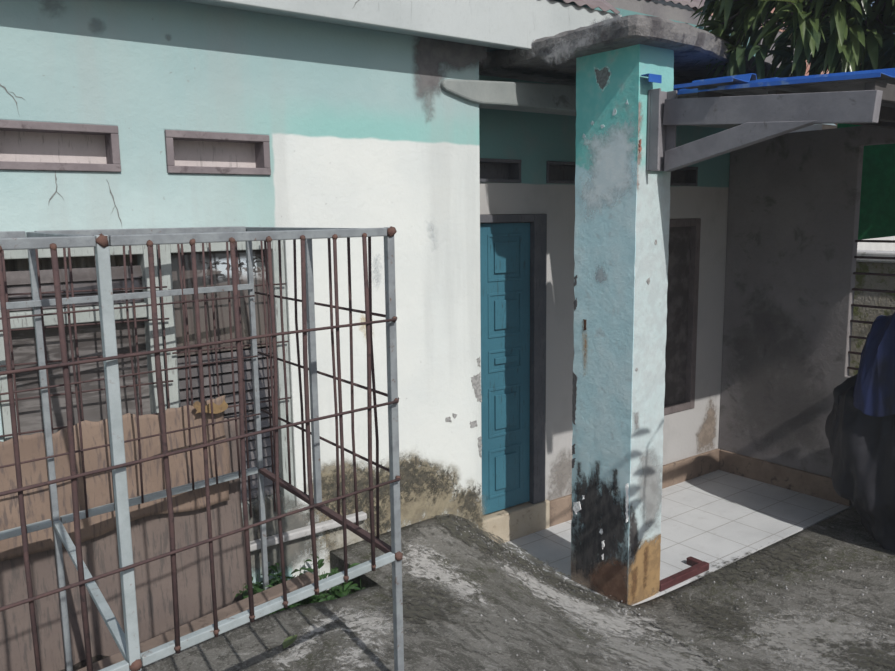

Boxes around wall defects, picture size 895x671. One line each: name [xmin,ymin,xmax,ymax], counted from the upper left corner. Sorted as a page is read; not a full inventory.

spalling [594,65,612,92]
peeling [582,100,642,216]
peeling [471,357,482,402]
peeling [469,420,482,458]
leakage [242,455,484,573]
leakage [548,454,662,578]